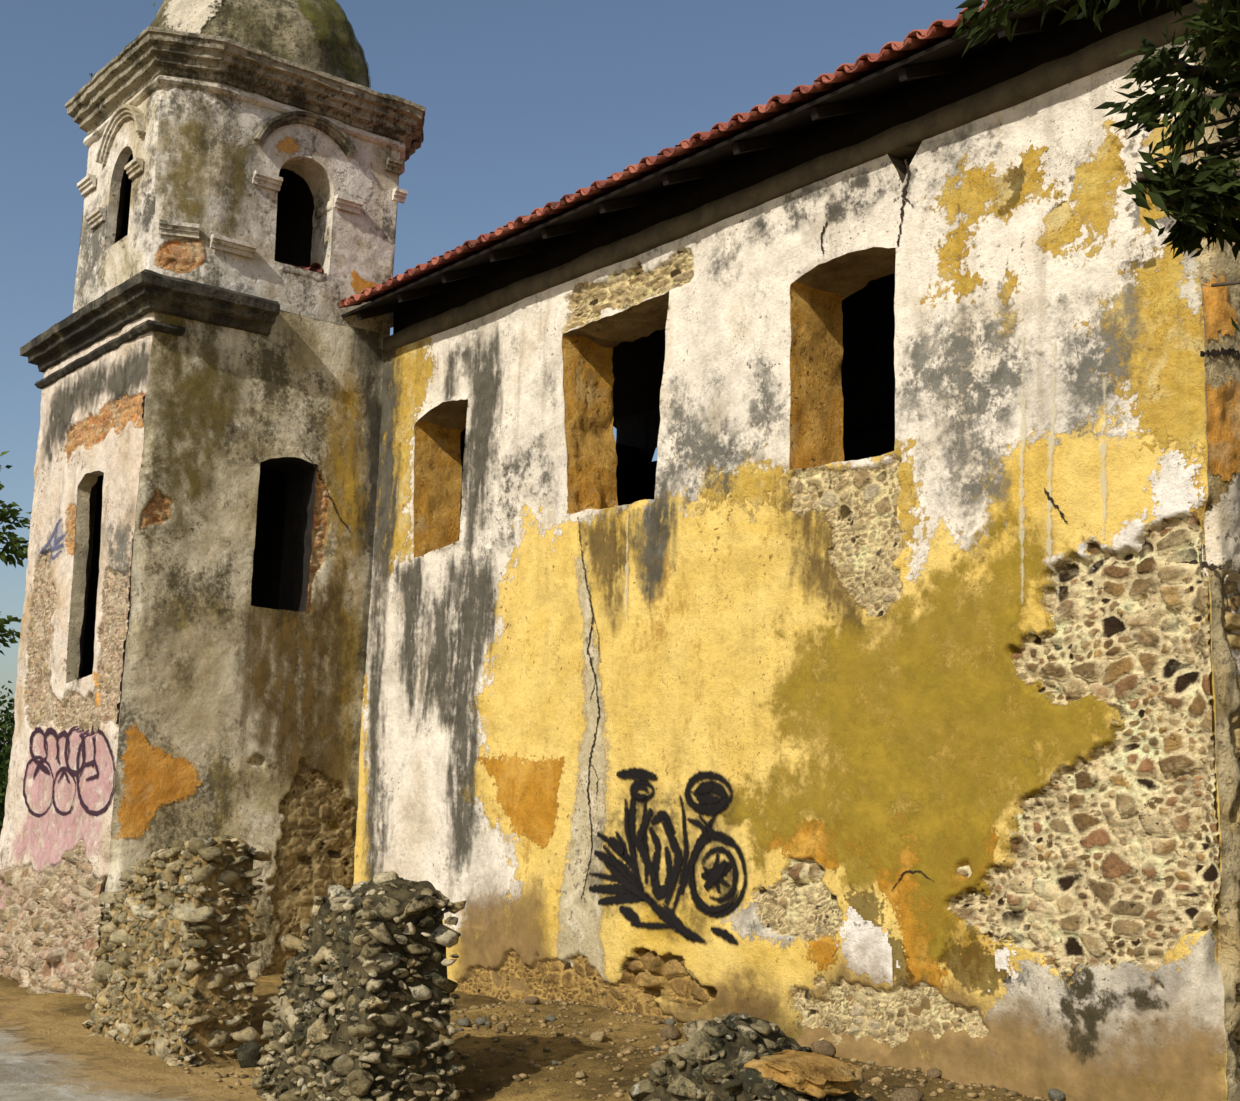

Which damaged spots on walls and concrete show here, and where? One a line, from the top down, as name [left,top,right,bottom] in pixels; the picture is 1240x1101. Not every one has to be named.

crack [819,221,827,254]
crack [897,159,914,246]
water stain [42,335,241,538]
mould [1058,285,1139,425]
flaking render [23,490,203,840]
water stain [107,524,133,601]
water stain [237,327,553,881]
crack [577,517,600,898]
peeling [263,38,1240,1082]
water stain [720,307,1122,961]
water stain [797,964,1226,1101]